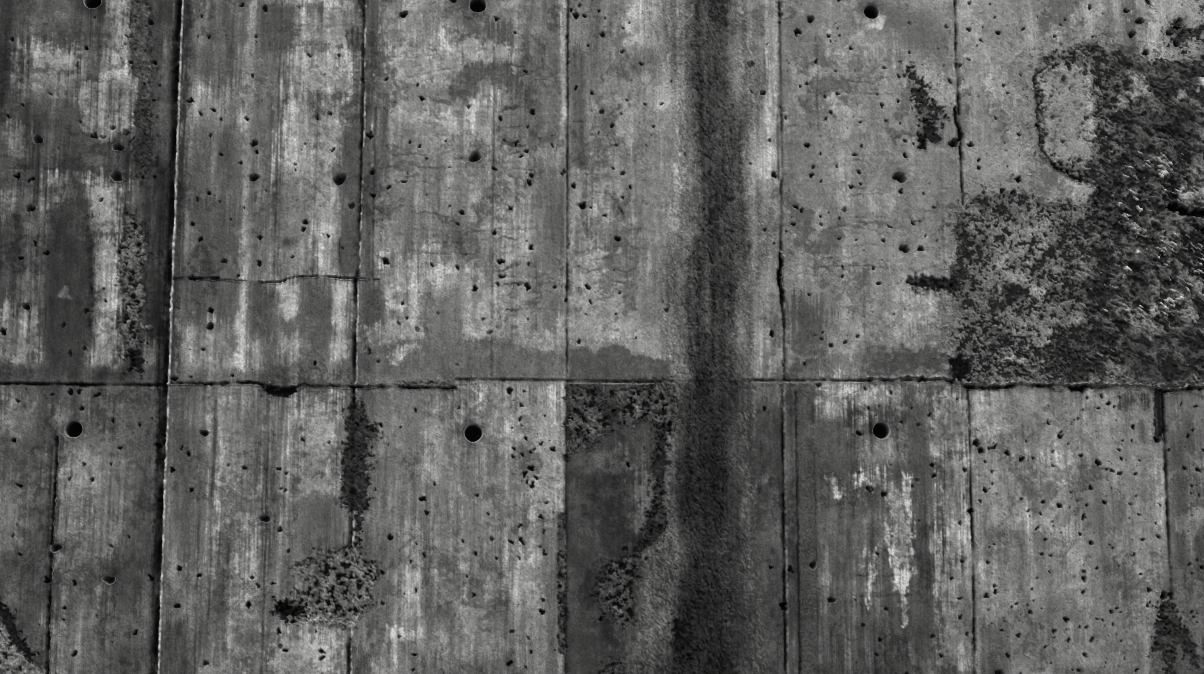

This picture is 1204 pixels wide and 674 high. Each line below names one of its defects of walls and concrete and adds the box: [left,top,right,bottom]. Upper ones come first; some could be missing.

spalling [109,202,156,381]
crack [172,236,381,284]
leakage [237,0,840,674]
spalling [896,0,1204,392]
spalling [0,602,58,674]
spalling [269,395,385,633]
spalling [555,513,569,656]
spalling [557,374,681,633]